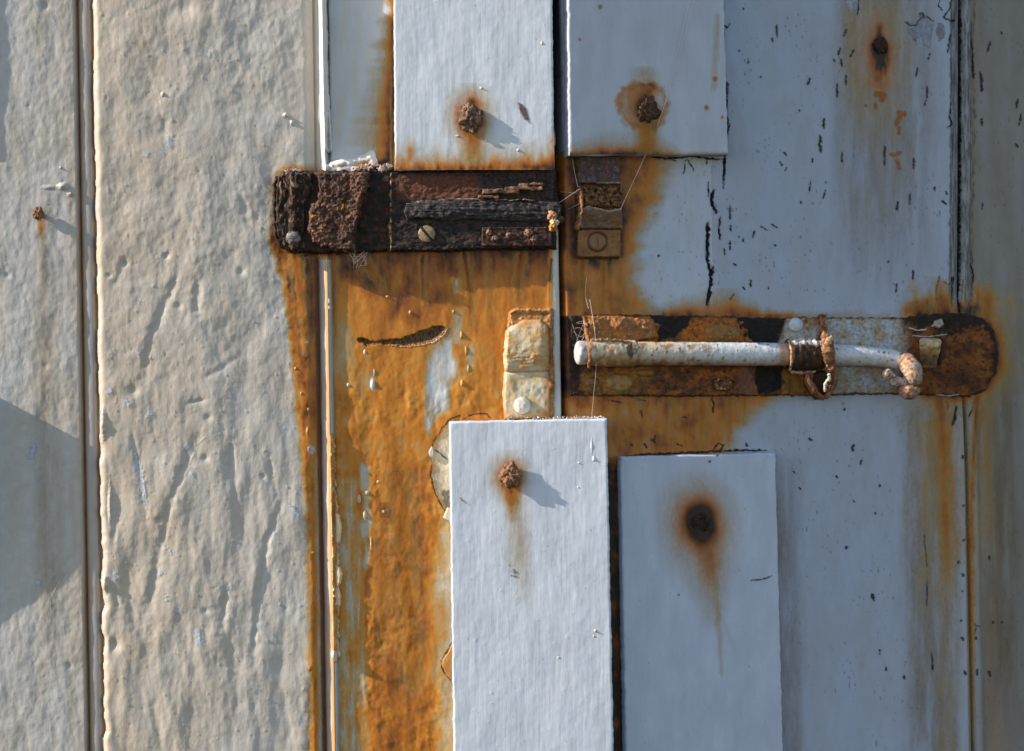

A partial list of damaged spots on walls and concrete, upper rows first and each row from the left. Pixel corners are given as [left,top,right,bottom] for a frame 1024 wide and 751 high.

corrosion [863,20,894,109]
corrosion [895,110,906,135]
peeling [905,0,976,303]
corrosion [270,0,800,751]
corrosion [902,283,1008,642]